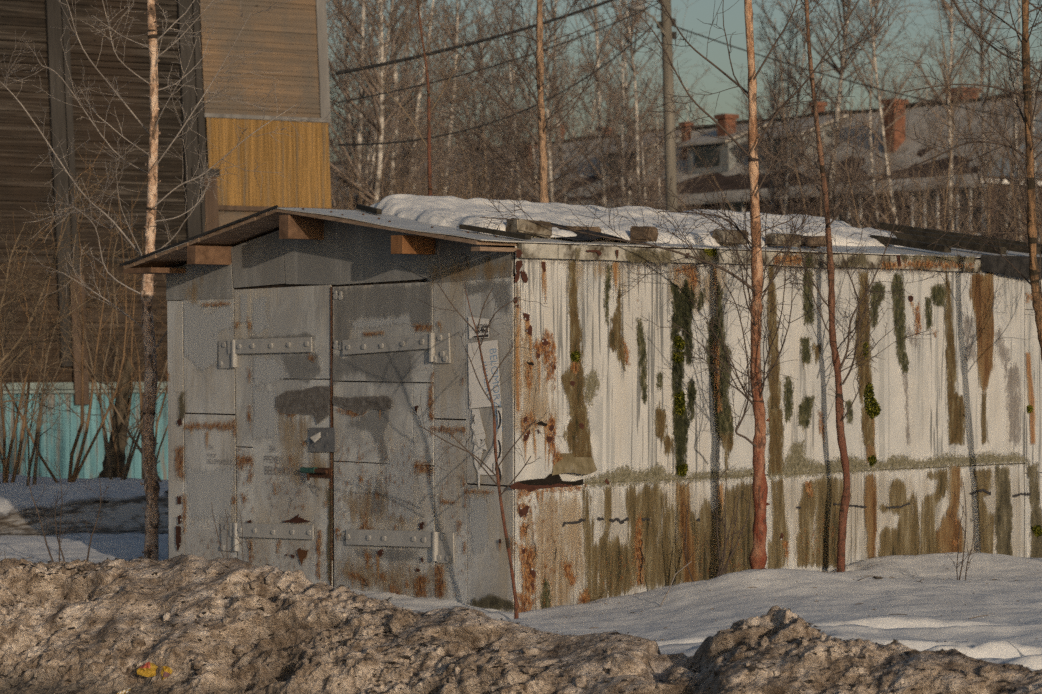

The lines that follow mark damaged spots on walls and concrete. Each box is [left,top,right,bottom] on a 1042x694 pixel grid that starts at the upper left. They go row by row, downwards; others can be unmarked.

corrosion [513,293,563,466]
corrosion [239,530,326,579]
corrosion [325,371,492,598]